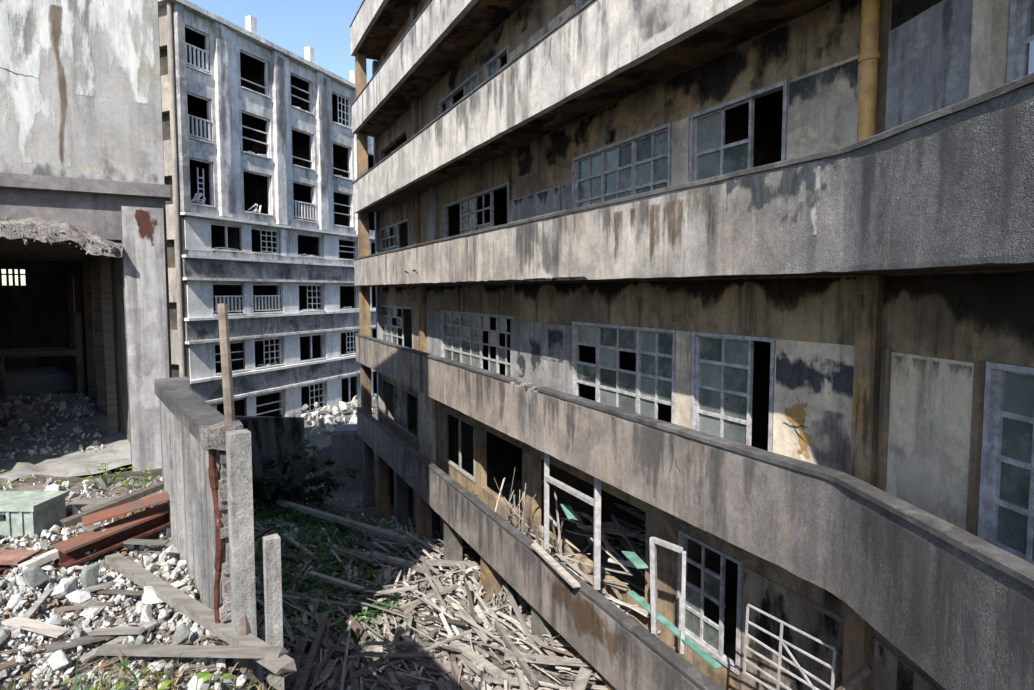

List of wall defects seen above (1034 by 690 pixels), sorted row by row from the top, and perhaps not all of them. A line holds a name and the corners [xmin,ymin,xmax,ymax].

rust [49,5,66,161]
peeling [0,0,155,163]
rust [134,209,157,246]
damp [604,195,683,257]
damp [726,158,837,235]
damp [484,223,871,310]
damp [883,270,1034,347]
peeling [785,401,813,458]
damp [897,661,914,690]